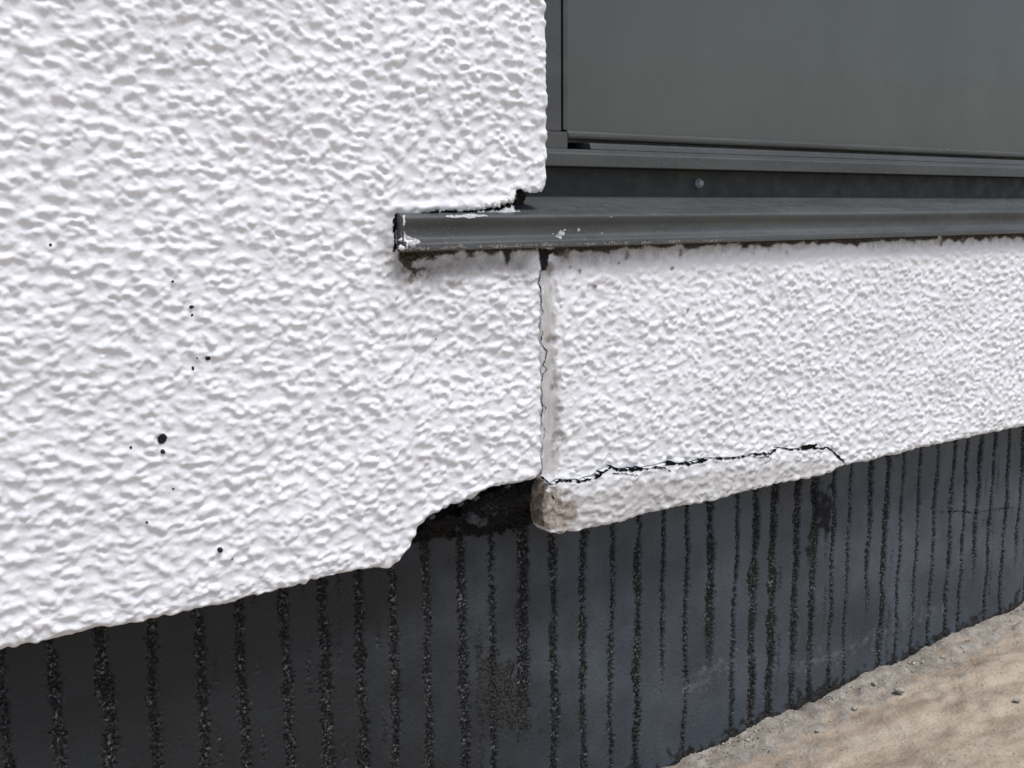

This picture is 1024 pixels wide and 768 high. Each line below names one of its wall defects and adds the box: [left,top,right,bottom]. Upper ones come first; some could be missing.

crack [538,248,847,500]
flaking render [411,479,541,547]